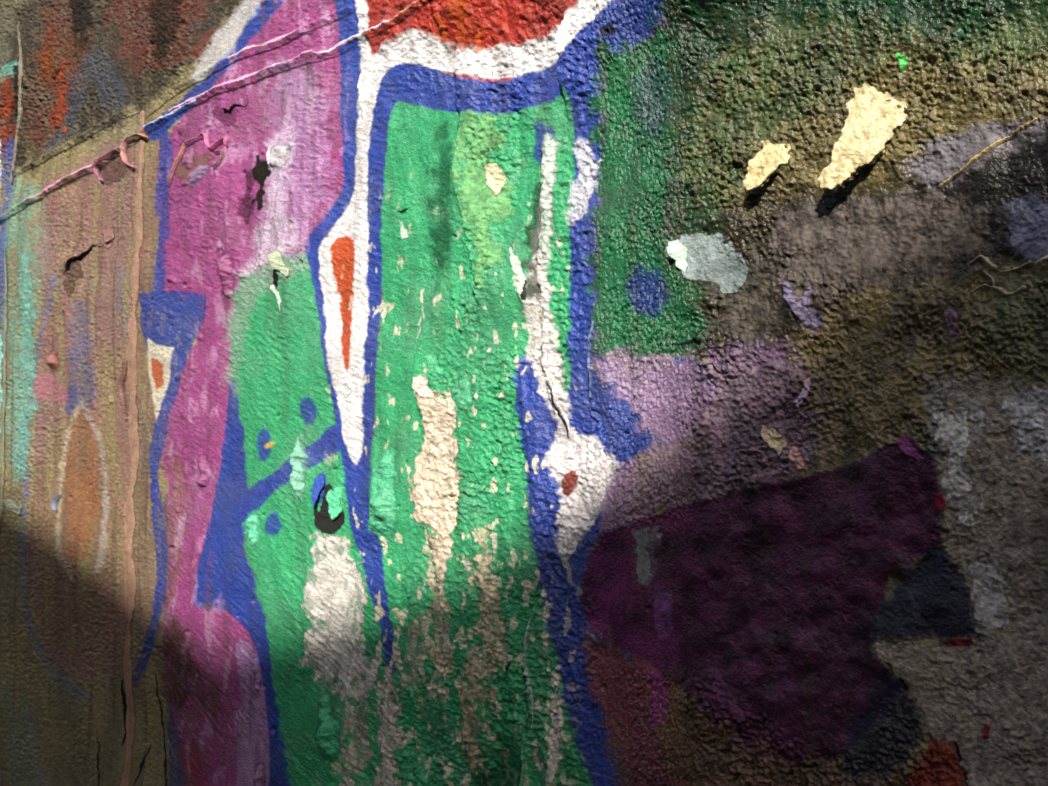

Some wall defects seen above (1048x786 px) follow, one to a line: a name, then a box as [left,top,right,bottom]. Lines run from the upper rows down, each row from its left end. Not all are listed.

peeling [167,92,248,188]
crack [0,0,431,223]
peeling [667,83,1048,346]
spalling [874,372,1048,786]